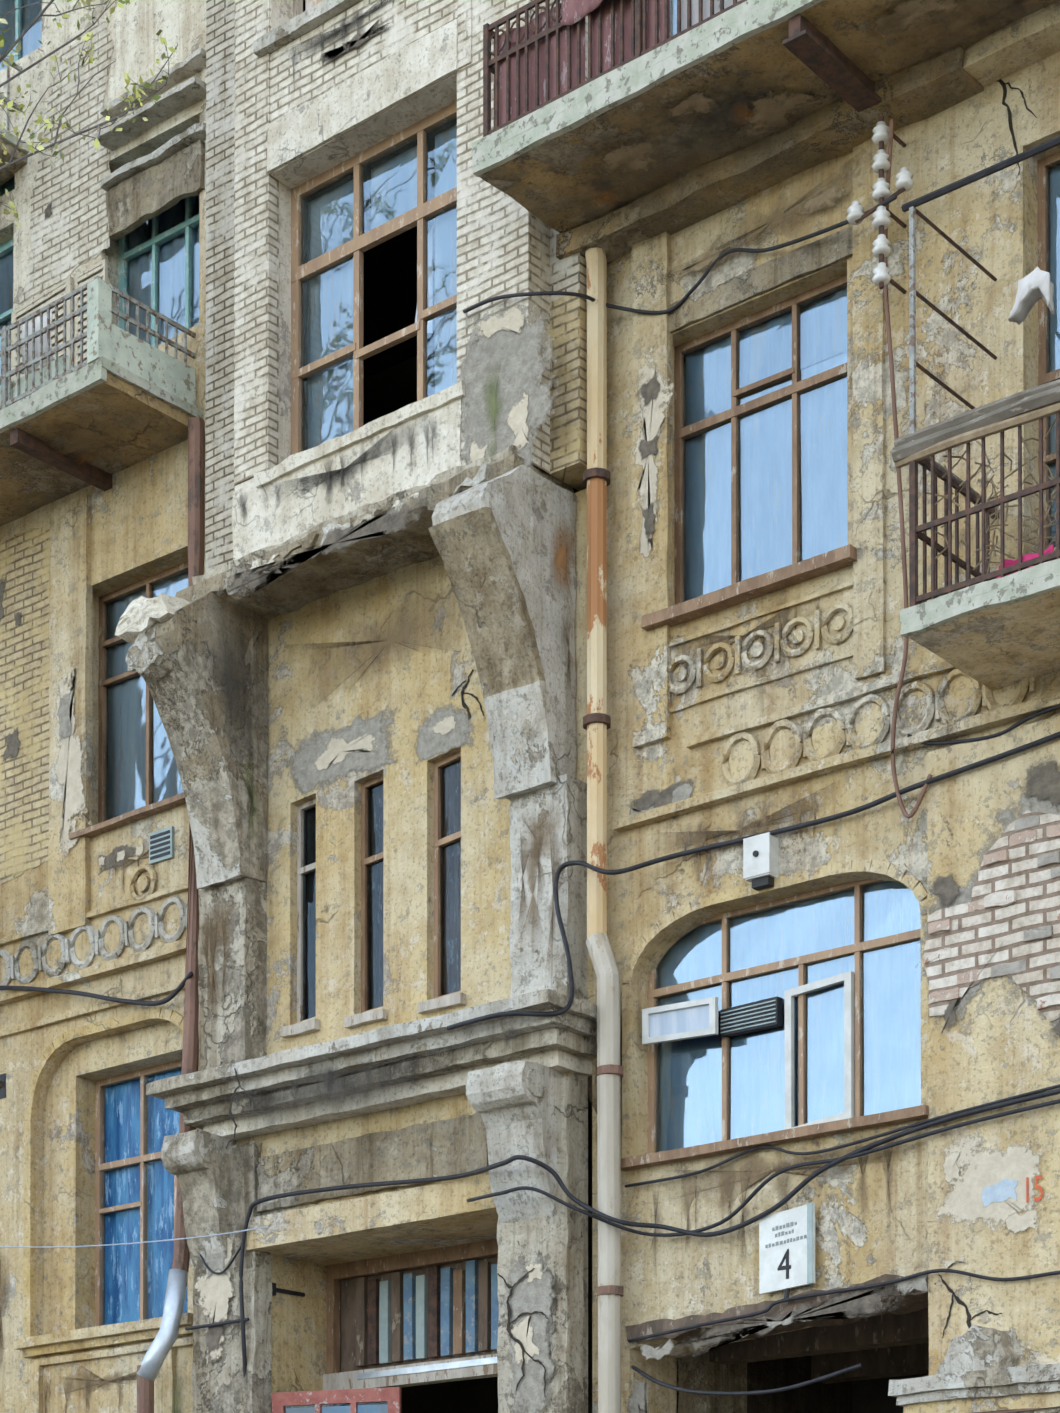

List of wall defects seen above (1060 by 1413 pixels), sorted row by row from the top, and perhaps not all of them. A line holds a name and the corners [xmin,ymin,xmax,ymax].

crack [996,79,1037,175]
flaking render [633,347,674,559]
flaking render [284,708,397,792]
flaking render [416,704,473,764]
flaking render [920,760,1060,1037]
crack [498,1268,549,1397]
peeling [765,1309,794,1328]